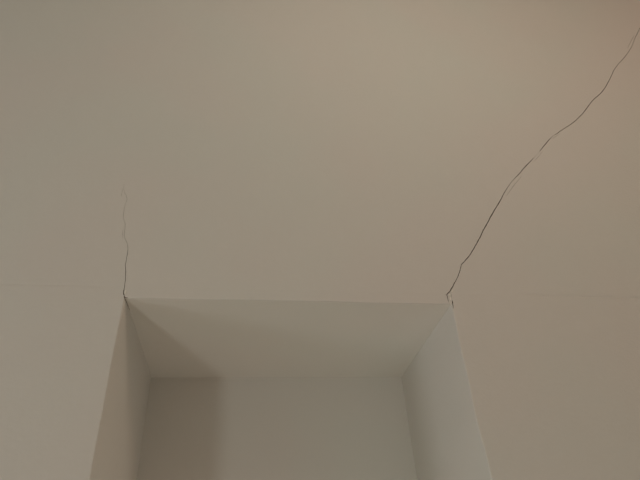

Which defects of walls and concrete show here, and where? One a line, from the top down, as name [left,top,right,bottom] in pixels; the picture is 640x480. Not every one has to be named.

crack [122,192,130,310]
crack [446,28,640,306]